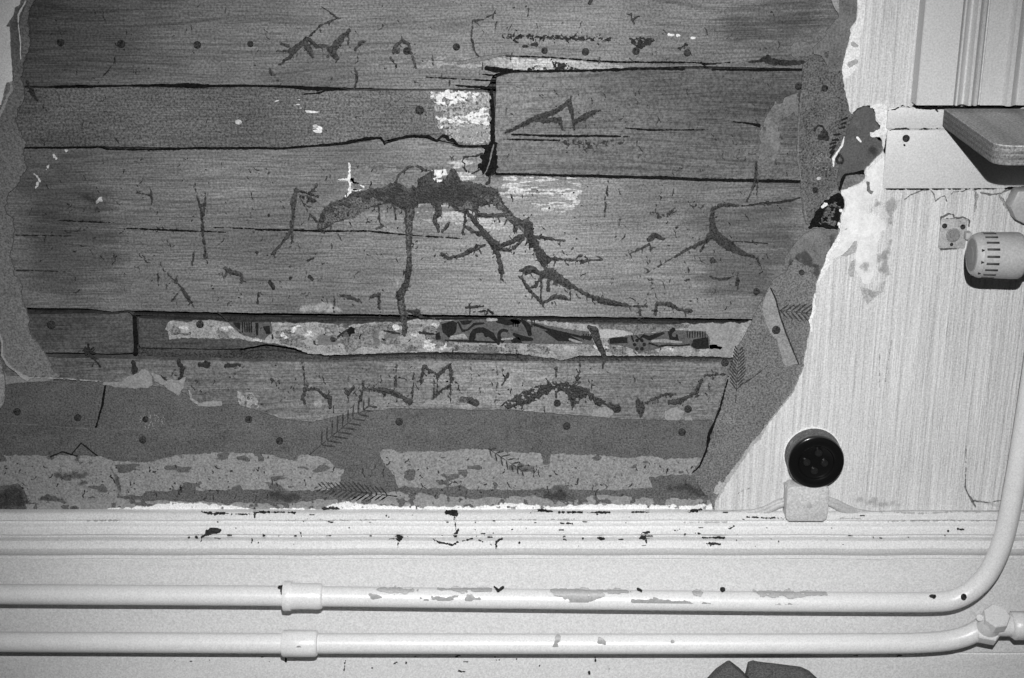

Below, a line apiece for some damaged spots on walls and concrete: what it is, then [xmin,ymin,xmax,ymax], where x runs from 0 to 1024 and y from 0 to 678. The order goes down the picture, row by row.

peeling [417,54,624,70]
peeling [426,89,491,145]
peeling [432,158,482,182]
peeling [500,176,582,213]
peeling [417,205,508,230]
damp [300,302,339,312]
peeling [377,363,554,407]
crack [95,385,106,428]
peeling [108,501,251,509]
peeling [327,501,712,509]
peeling [368,586,504,601]
peeling [550,587,711,604]